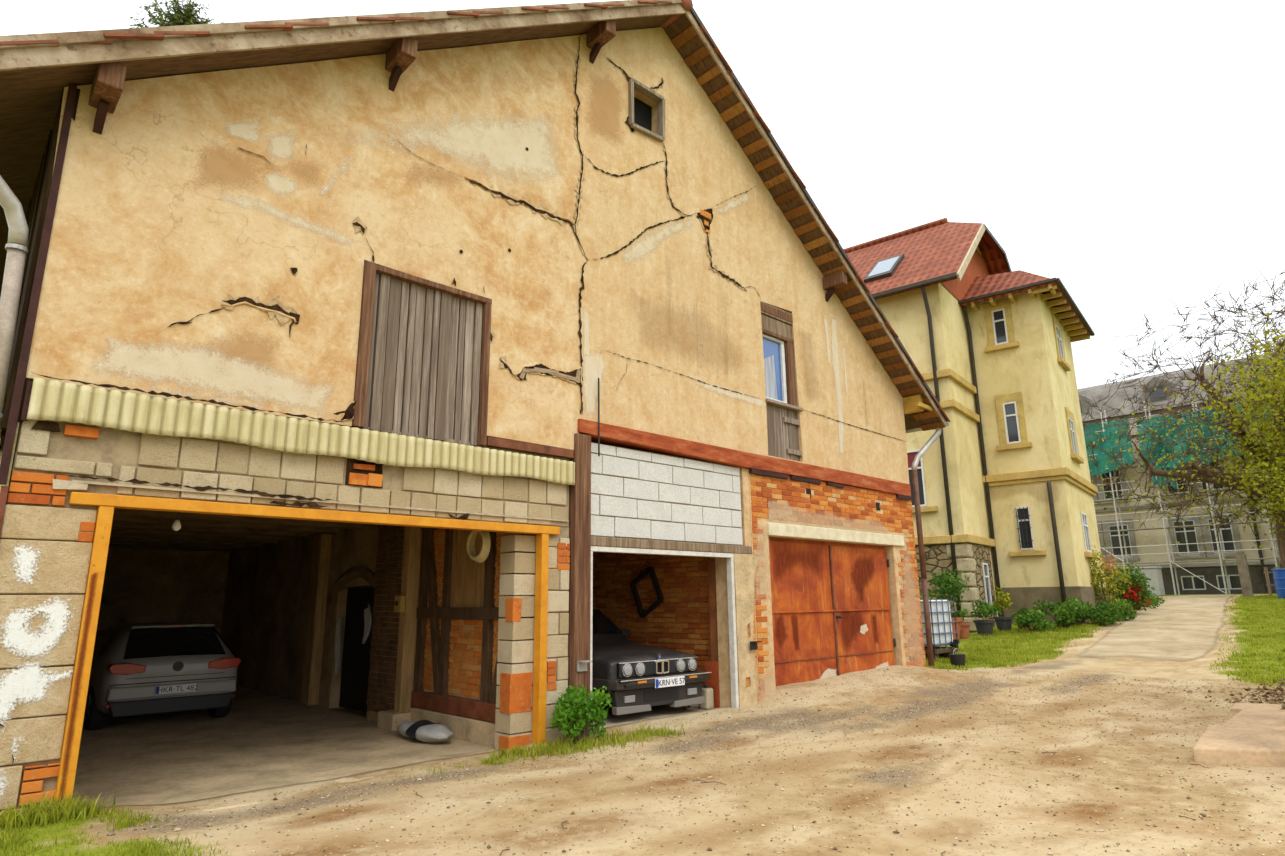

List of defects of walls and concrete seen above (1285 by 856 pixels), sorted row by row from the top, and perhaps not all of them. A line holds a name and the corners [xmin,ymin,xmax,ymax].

crack [400,33,762,414]
crack [166,293,300,335]
crack [808,411,907,442]